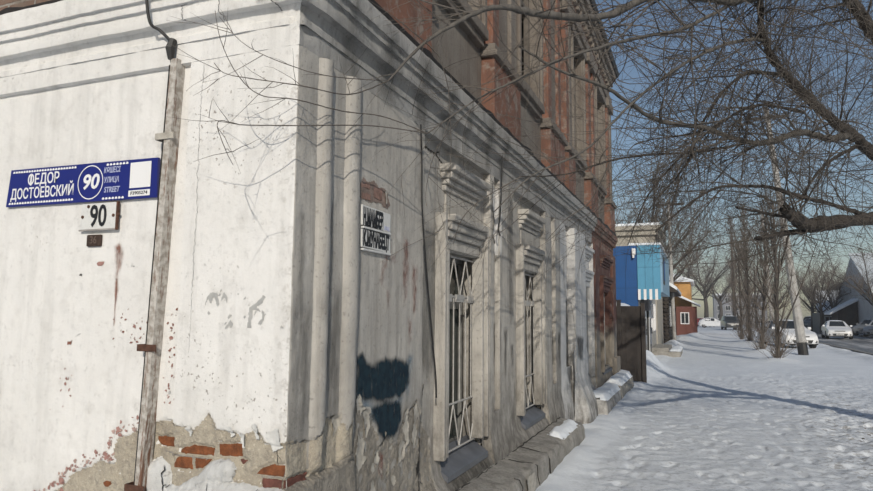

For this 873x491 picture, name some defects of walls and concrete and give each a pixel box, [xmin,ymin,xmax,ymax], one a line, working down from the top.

flaking render [360,177,390,209]
flaking render [34,415,139,491]
flaking render [152,394,437,491]